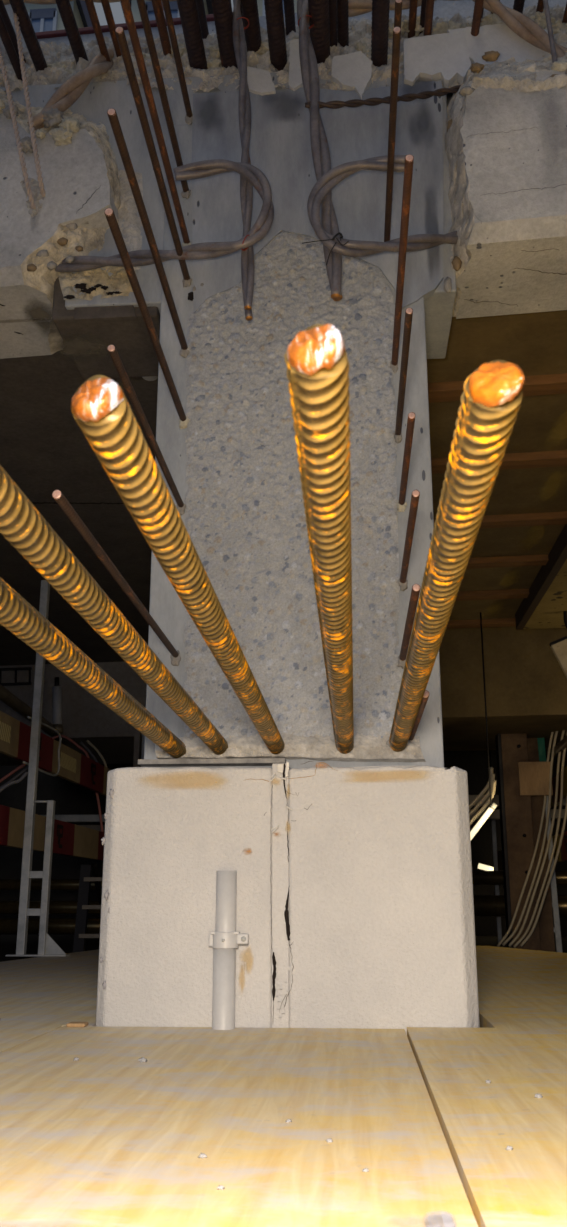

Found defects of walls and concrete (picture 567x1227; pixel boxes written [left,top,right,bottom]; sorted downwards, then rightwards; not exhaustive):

spalling [0,0,567,781]
crack [243,761,335,1015]